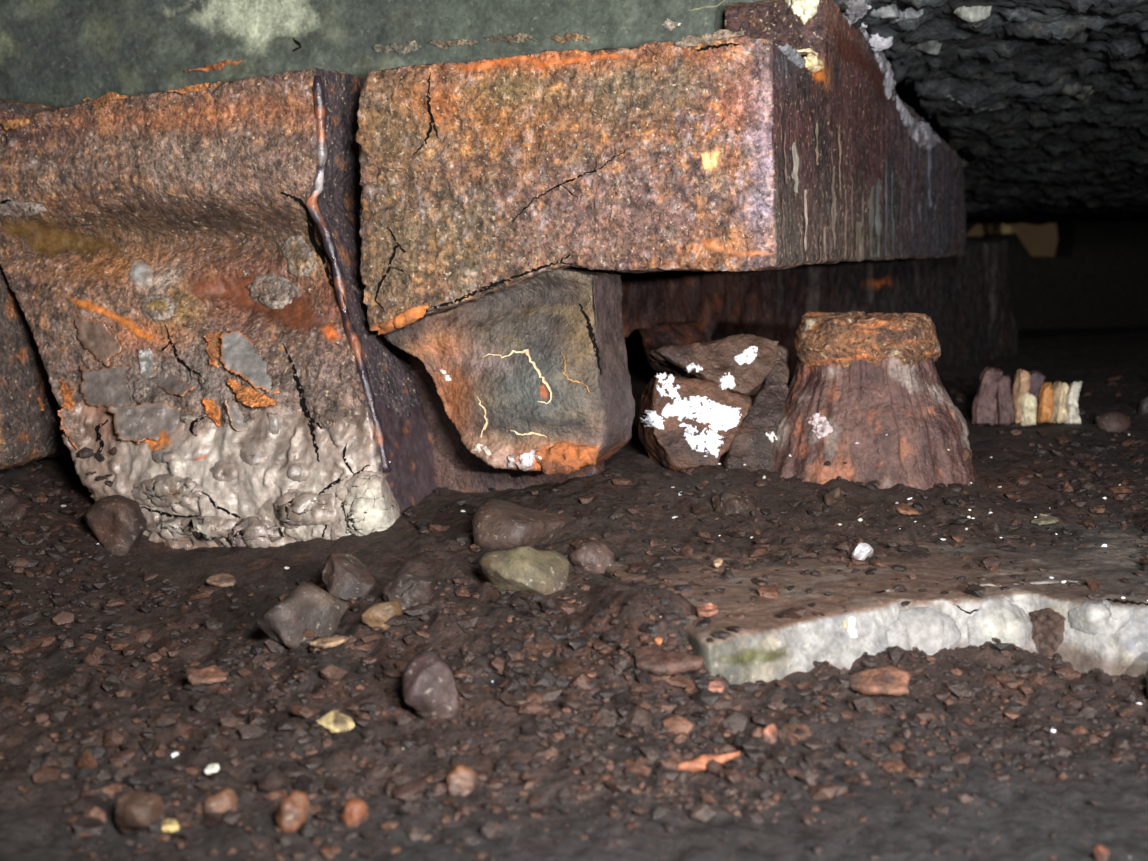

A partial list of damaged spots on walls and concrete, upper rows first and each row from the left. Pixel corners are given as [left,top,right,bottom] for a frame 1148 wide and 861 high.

corrosion [461,54,616,69]
crack [413,74,440,156]
crack [280,192,333,287]
corrosion [73,299,152,338]
corrosion [188,277,338,341]
corrosion [369,306,429,335]
crack [425,254,583,313]
crack [578,303,602,375]
corrosion [144,431,170,451]
crack [282,343,370,495]
corrosion [534,441,600,475]
crack [141,491,241,518]